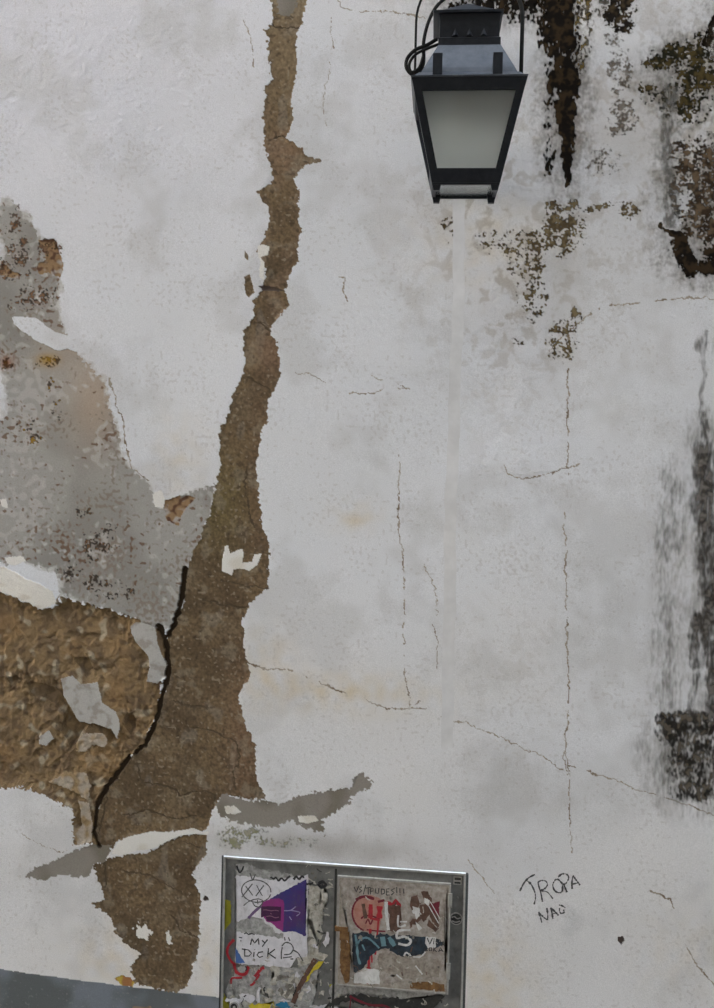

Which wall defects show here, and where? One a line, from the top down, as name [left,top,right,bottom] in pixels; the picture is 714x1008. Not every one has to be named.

water stain [448,0,639,188]
water stain [701,16,714,58]
water stain [475,199,641,324]
water stain [545,306,582,360]
water stain [658,132,714,279]
spalling [0,0,372,993]
water stain [655,387,714,802]
crack [92,566,188,848]